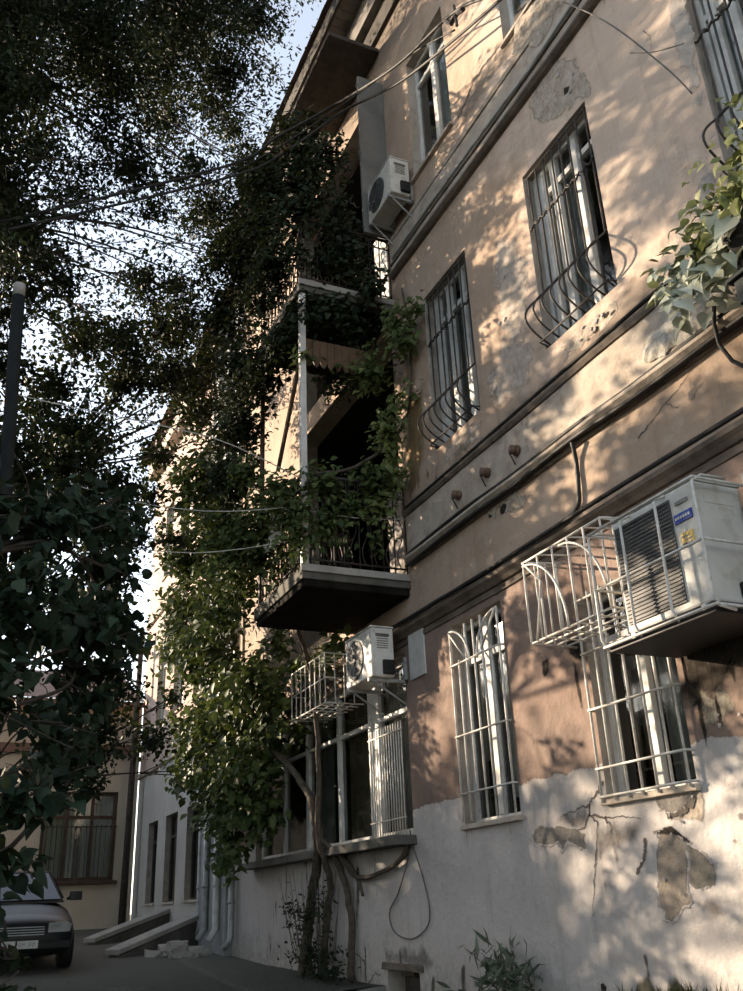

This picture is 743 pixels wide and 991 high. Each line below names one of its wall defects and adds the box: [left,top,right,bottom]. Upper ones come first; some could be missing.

peeling [669,0,700,89]
spalling [529,59,591,123]
crack [638,369,692,439]
damp [680,636,743,741]
spalling [533,812,586,854]
crack [563,781,641,916]
spalling [636,792,717,925]